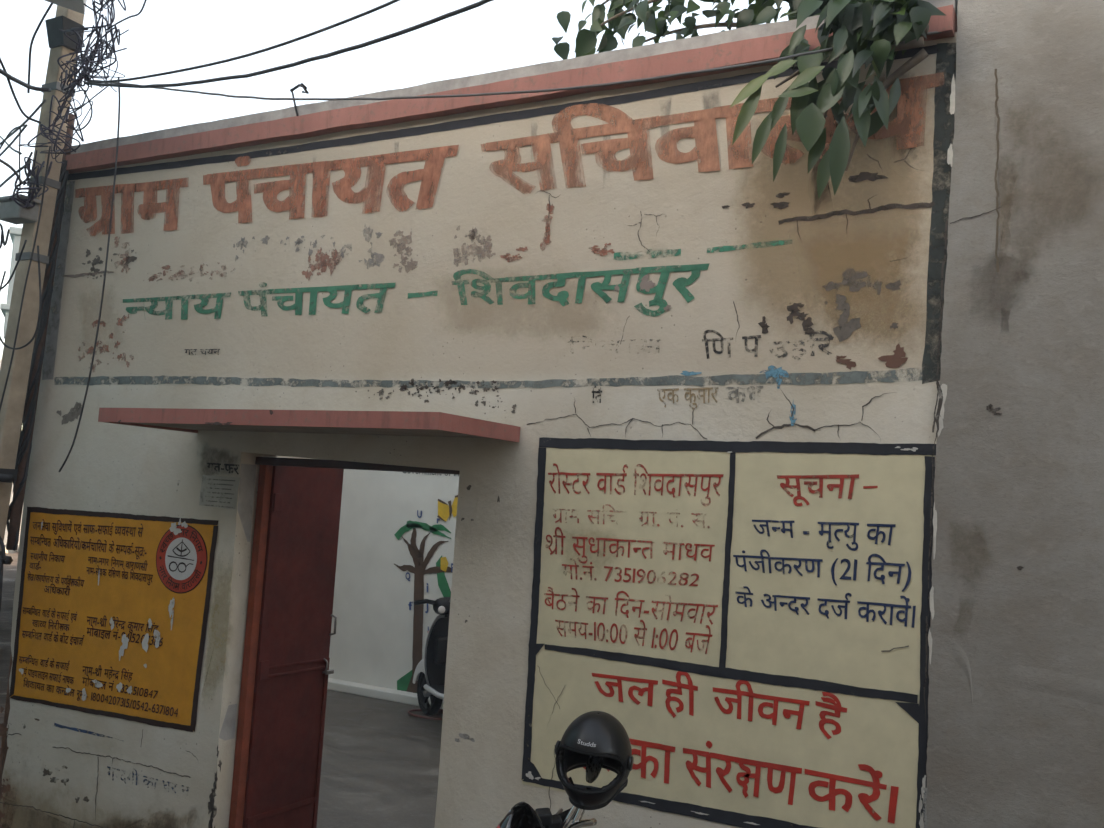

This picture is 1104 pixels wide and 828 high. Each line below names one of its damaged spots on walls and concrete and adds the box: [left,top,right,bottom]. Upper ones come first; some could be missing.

peeling [63,237,137,279]
peeling [149,235,351,282]
peeling [359,230,418,273]
peeling [453,204,554,266]
peeling [787,303,816,335]
peeling [822,268,902,342]
peeling [836,356,856,370]
peeling [878,344,908,368]
crack [527,398,707,439]
crack [755,386,895,441]
crack [778,69,1002,730]
peeling [142,597,175,668]